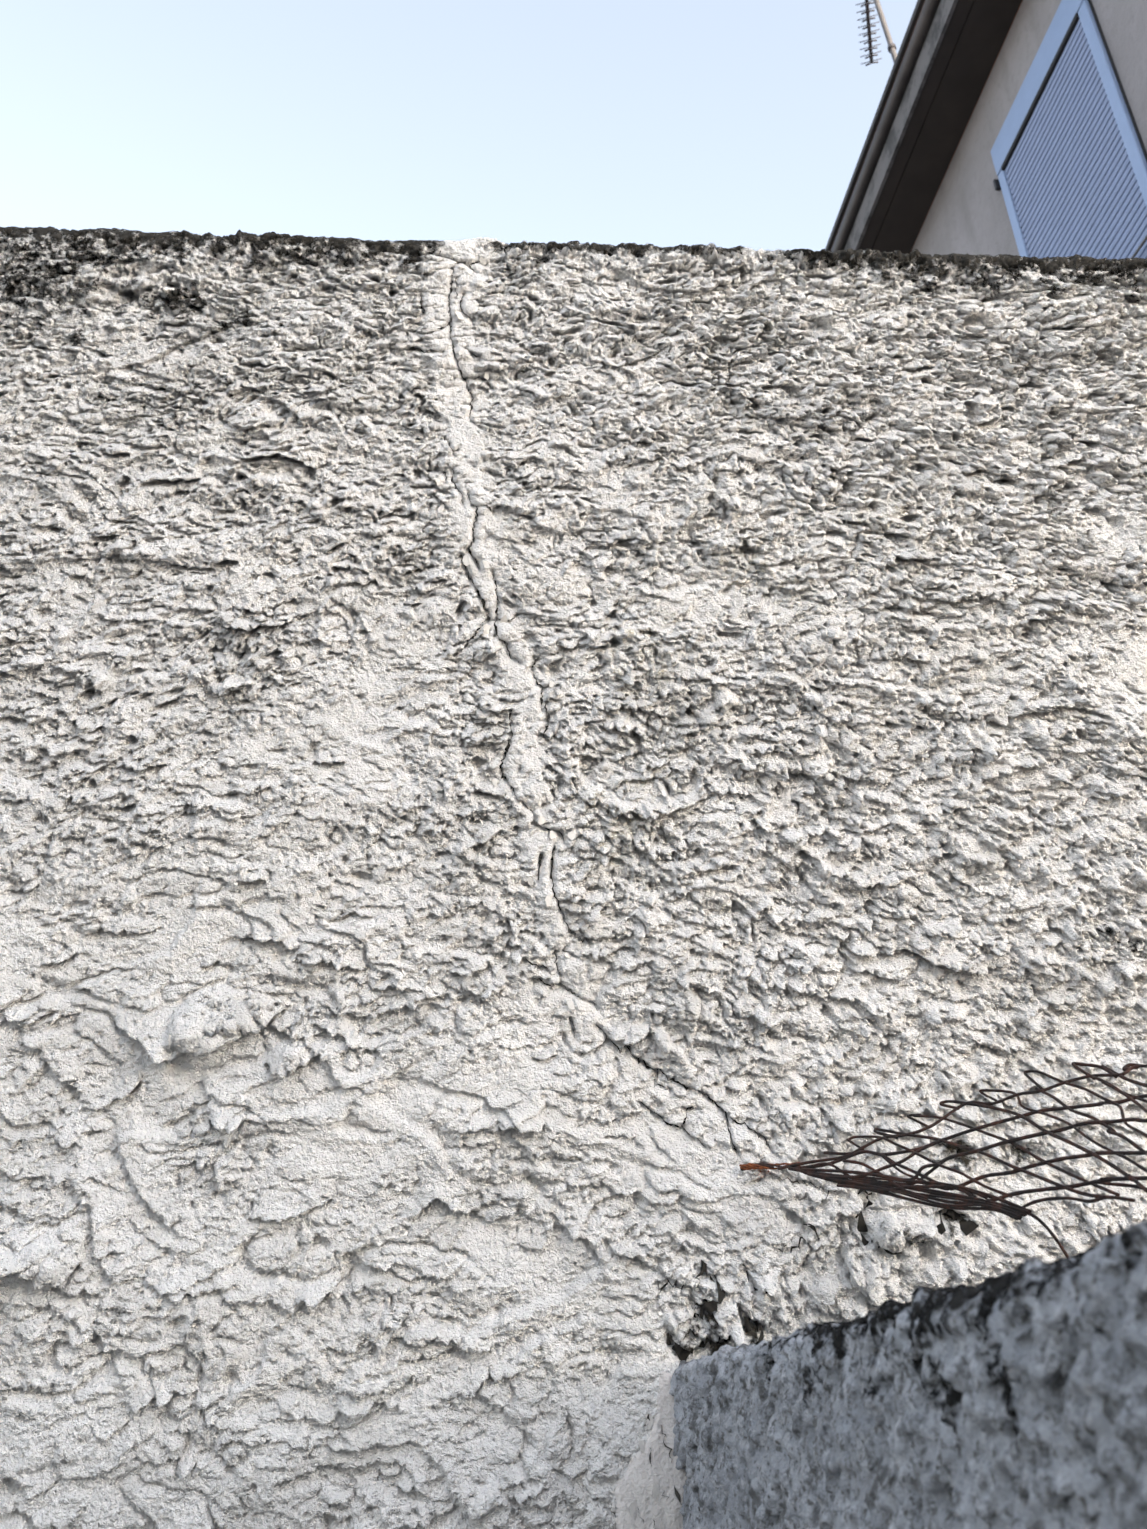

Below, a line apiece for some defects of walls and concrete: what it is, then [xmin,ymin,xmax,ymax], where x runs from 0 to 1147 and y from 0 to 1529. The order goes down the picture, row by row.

crack [411,252,902,1255]
crack [937,1209,979,1236]